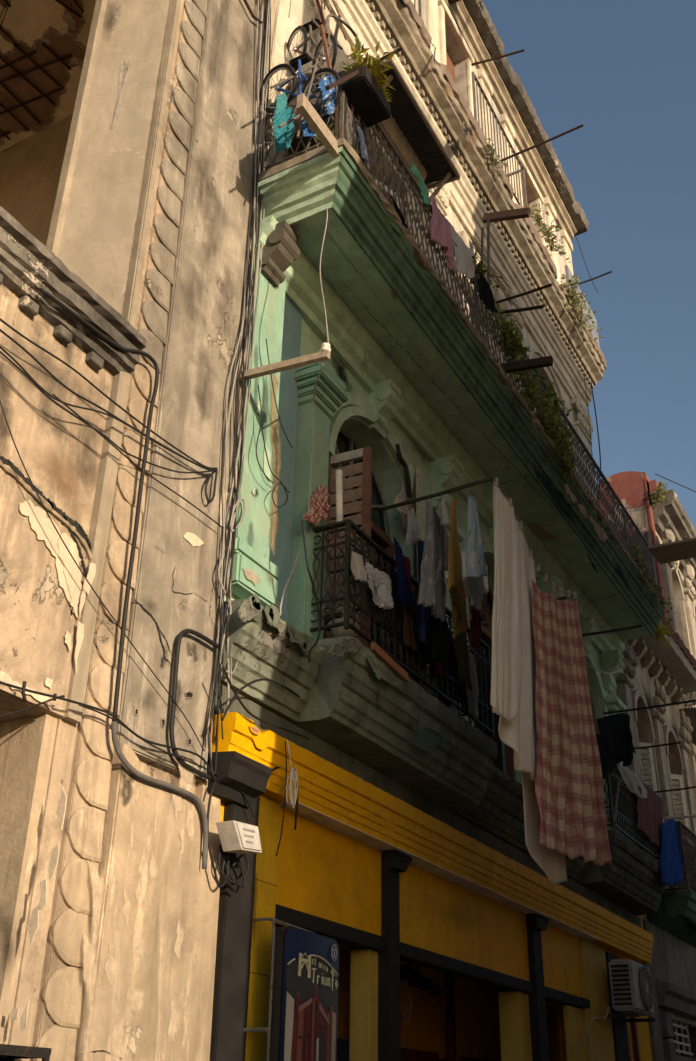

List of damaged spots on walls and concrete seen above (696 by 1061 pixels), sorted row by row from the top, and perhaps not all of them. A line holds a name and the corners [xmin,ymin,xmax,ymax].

spalling [0,28,84,140]
peeling [19,500,96,675]
peeling [183,532,204,547]